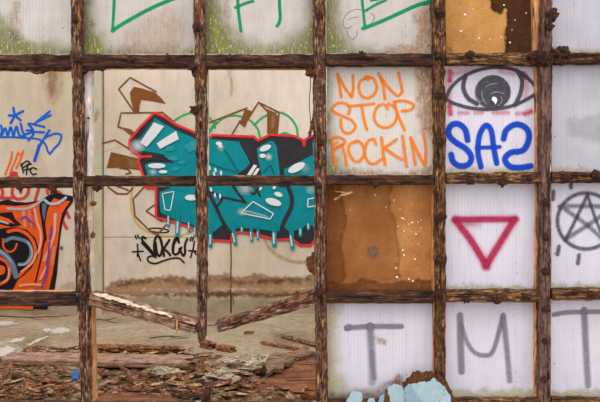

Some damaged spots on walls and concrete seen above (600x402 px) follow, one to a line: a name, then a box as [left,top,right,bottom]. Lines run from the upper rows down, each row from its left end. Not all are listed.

water stain [105,275,197,297]
water stain [207,273,315,298]
peeling [346,370,455,402]